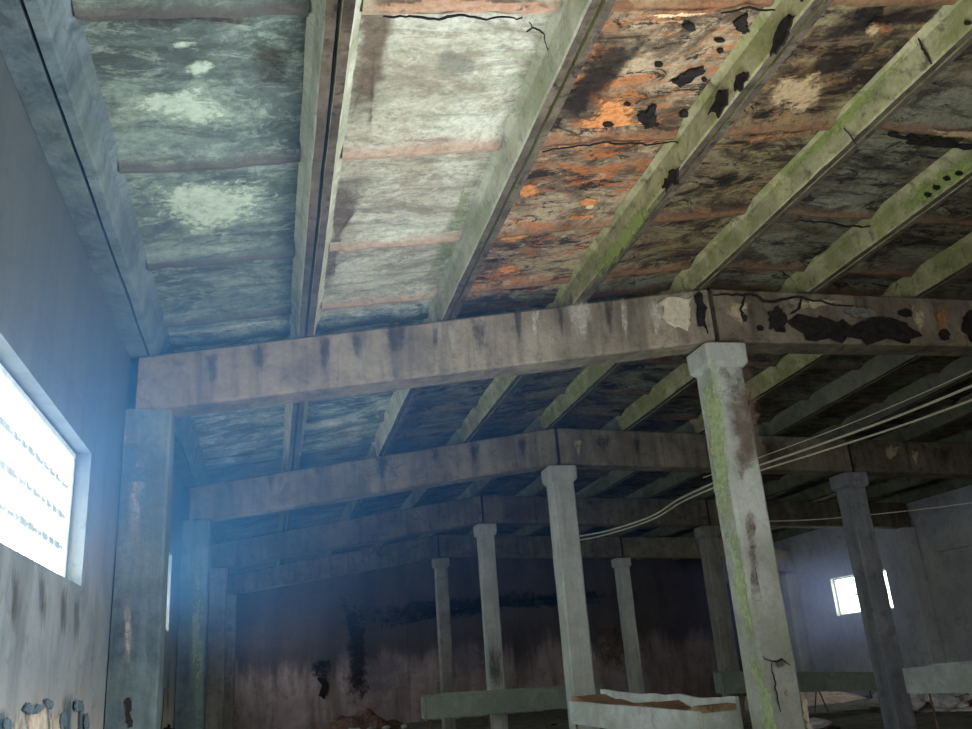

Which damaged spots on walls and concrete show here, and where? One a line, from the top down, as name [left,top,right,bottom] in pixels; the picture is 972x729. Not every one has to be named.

peeling [636,6,795,57]
efflorescence [132,61,227,124]
rust [582,98,659,129]
peeling [707,71,749,119]
damp [154,181,261,235]
rust [520,185,538,197]
rust [568,198,598,220]
spalling [658,291,709,334]
crack [712,293,854,322]
peeling [757,306,923,345]
damp [732,374,778,476]
crack [762,656,790,711]